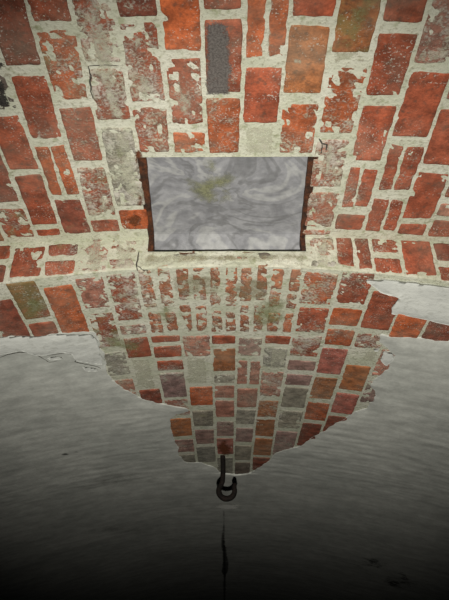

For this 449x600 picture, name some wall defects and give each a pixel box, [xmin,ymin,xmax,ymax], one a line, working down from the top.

crack [88,64,117,98]
flaking render [0,255,449,476]